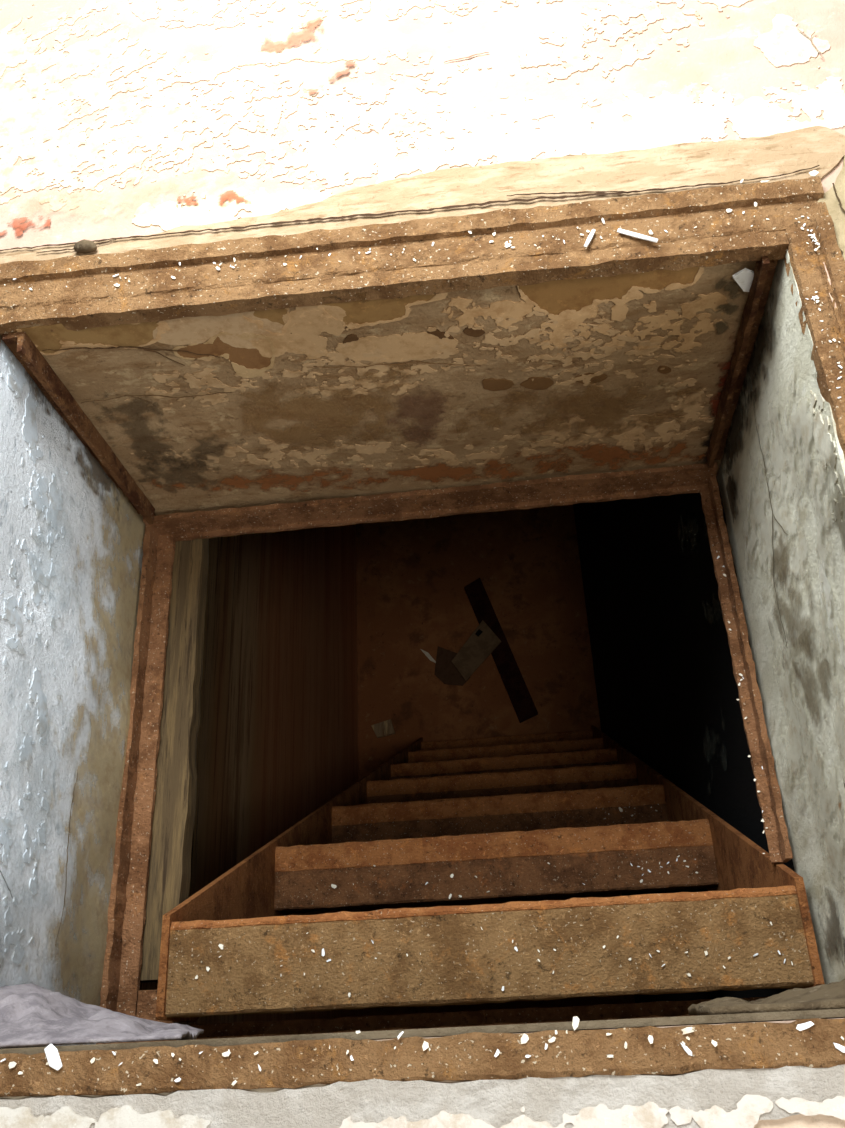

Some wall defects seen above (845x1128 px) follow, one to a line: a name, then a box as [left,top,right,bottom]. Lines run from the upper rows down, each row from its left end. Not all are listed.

peeling [0,0,845,231]
flaking render [733,268,754,292]
leakage [98,395,226,491]
leakage [241,365,443,448]
leakage [457,384,700,442]
leakage [721,294,845,963]
spalling [340,1094,845,1128]